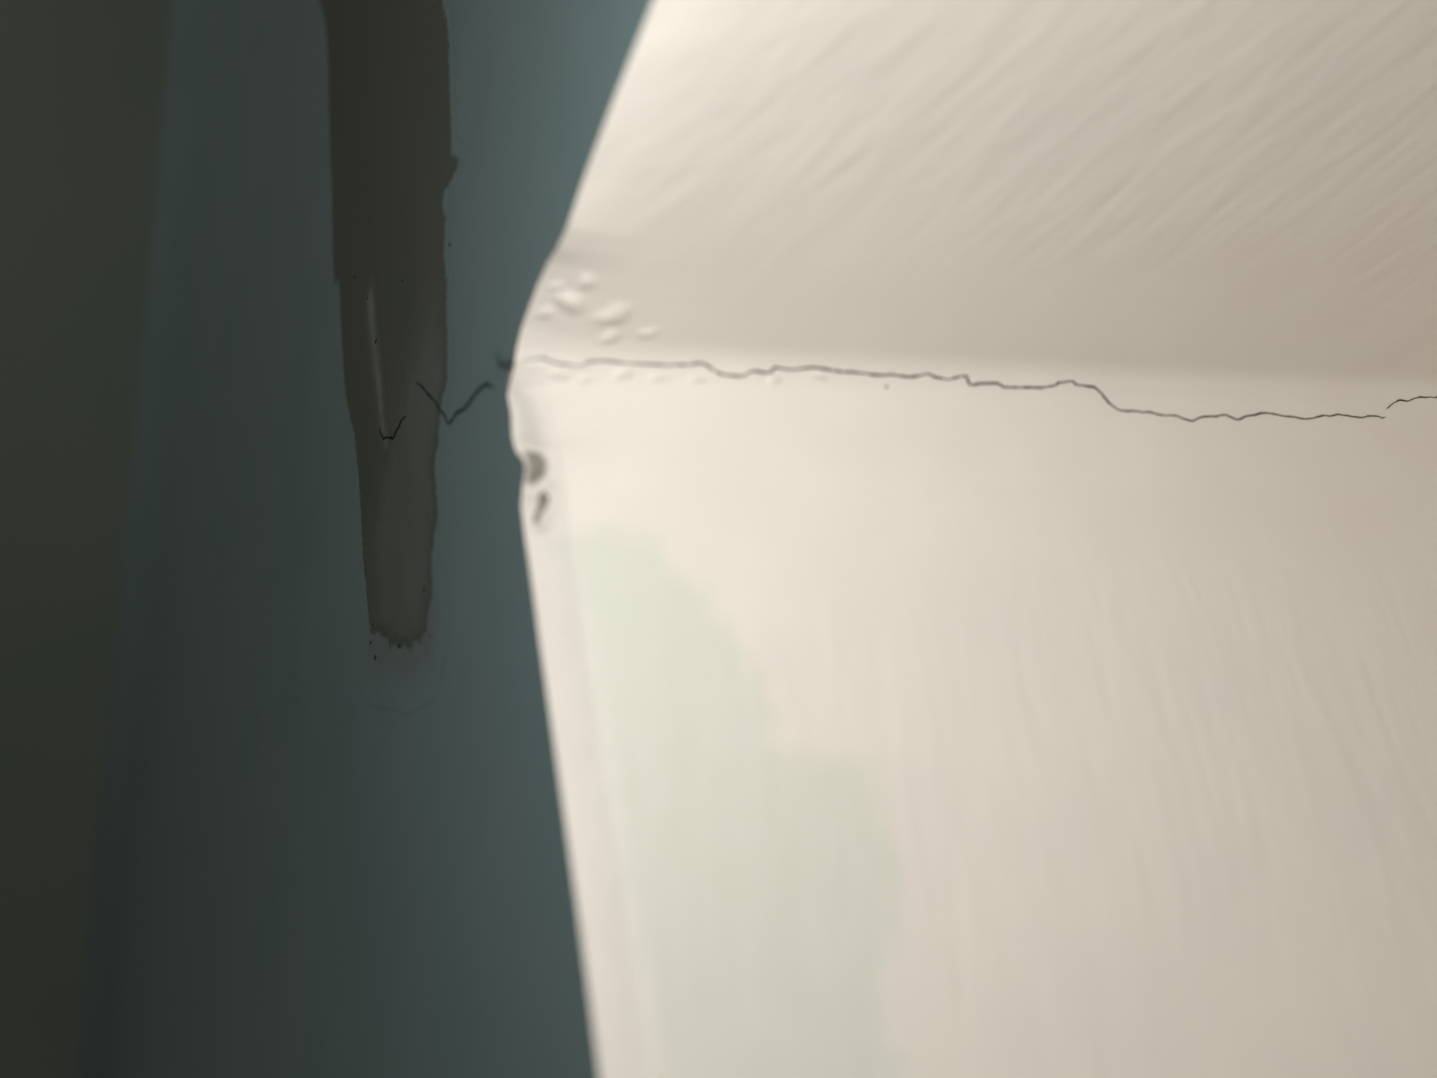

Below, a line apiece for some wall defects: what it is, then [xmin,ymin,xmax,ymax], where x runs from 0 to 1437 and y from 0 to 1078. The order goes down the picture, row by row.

peeling [317,0,465,716]
crack [378,382,493,440]
crack [517,357,1437,422]